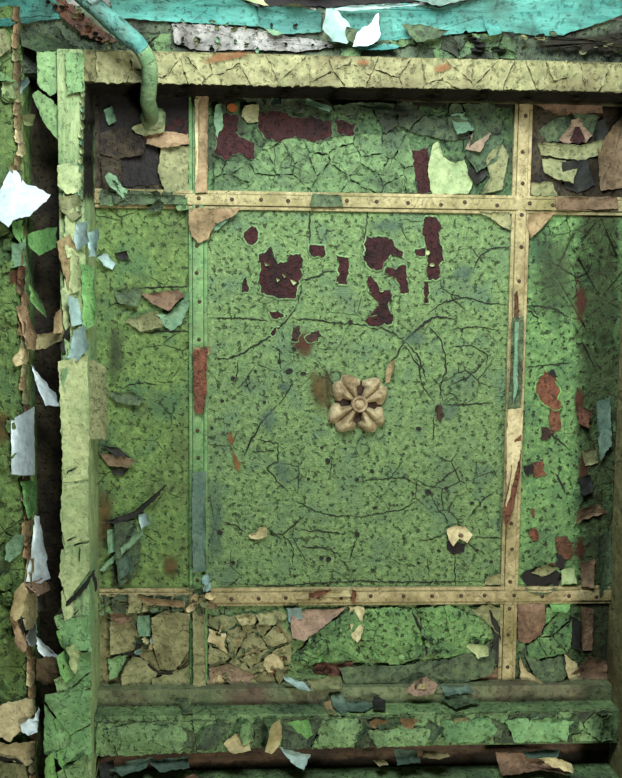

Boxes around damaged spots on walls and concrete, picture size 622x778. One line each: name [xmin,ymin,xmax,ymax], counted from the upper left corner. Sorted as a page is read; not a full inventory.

crack [95,51,622,93]
peeling [528,104,622,238]
peeling [240,224,351,337]
peeling [361,215,445,329]
peeling [0,0,146,778]
corrosion [193,346,211,414]
crack [210,271,508,587]
corrosion [503,408,546,532]
peeling [98,471,218,687]
corrosion [529,528,539,541]
corrosion [548,536,574,569]
peeling [96,694,613,778]